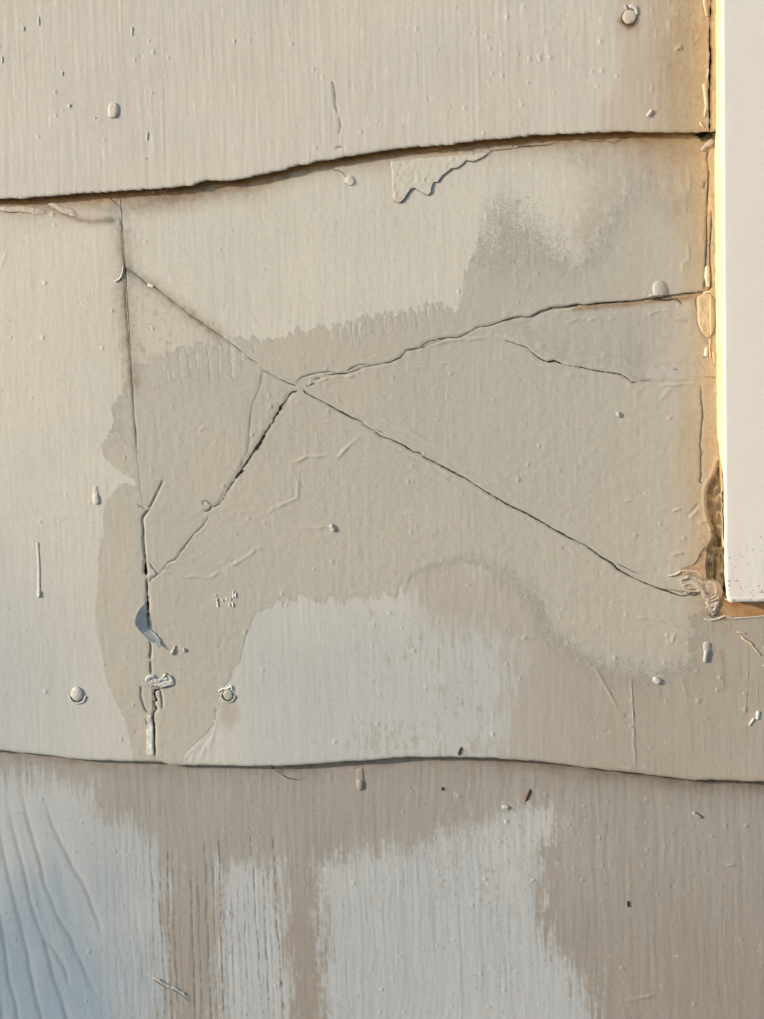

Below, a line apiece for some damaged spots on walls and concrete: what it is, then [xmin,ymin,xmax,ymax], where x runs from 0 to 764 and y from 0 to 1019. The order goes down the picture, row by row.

peeling [391,142,556,203]
crack [113,0,715,755]
crack [699,386,726,592]